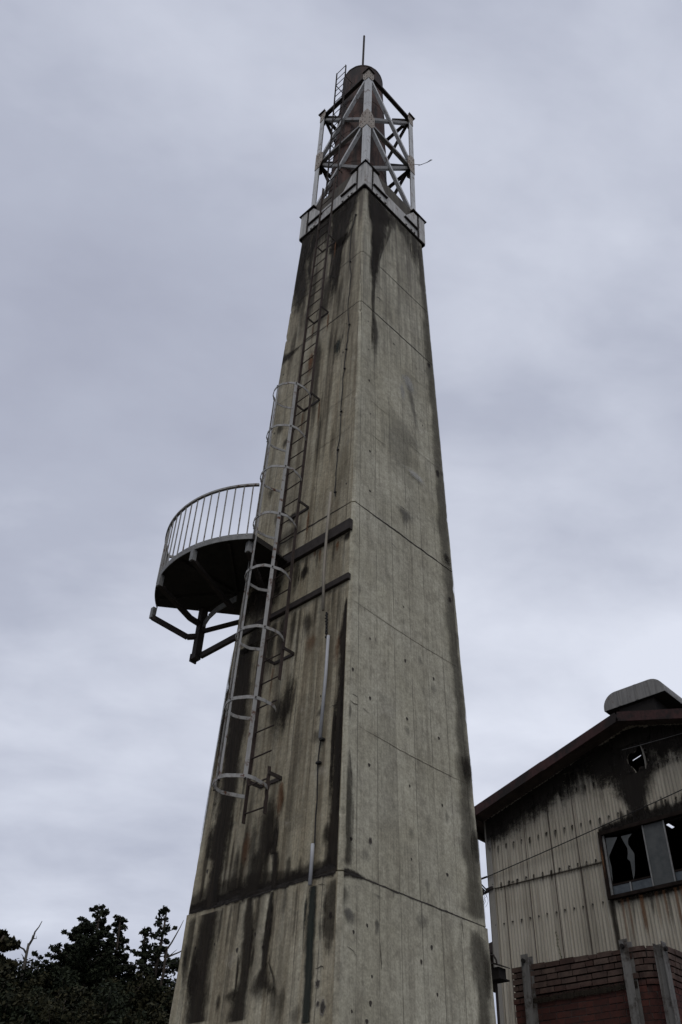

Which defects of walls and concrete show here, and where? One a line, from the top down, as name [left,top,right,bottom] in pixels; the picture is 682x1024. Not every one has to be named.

damp [292,192,418,348]
damp [182,557,370,1024]
damp [462,757,472,779]
damp [473,724,682,854]